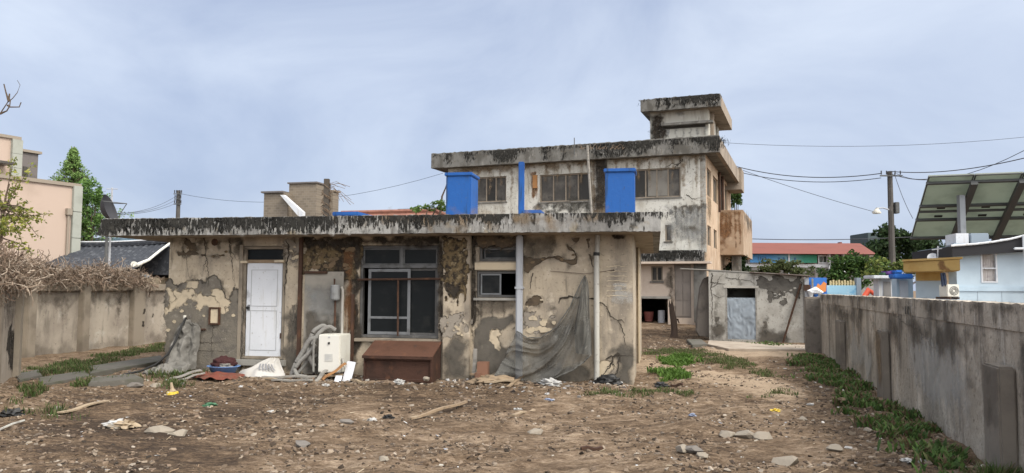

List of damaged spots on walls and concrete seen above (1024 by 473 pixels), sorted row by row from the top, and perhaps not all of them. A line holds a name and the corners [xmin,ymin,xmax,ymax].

damp [637,93,722,110]
peeling [177,238,228,258]
crack [186,238,235,283]
peeling [281,237,364,281]
damp [94,126,730,377]
peeling [523,238,593,273]
spalling [756,275,803,306]
spalling [142,274,244,371]
spalling [438,311,473,338]
peeling [523,295,556,334]
crack [559,295,631,375]